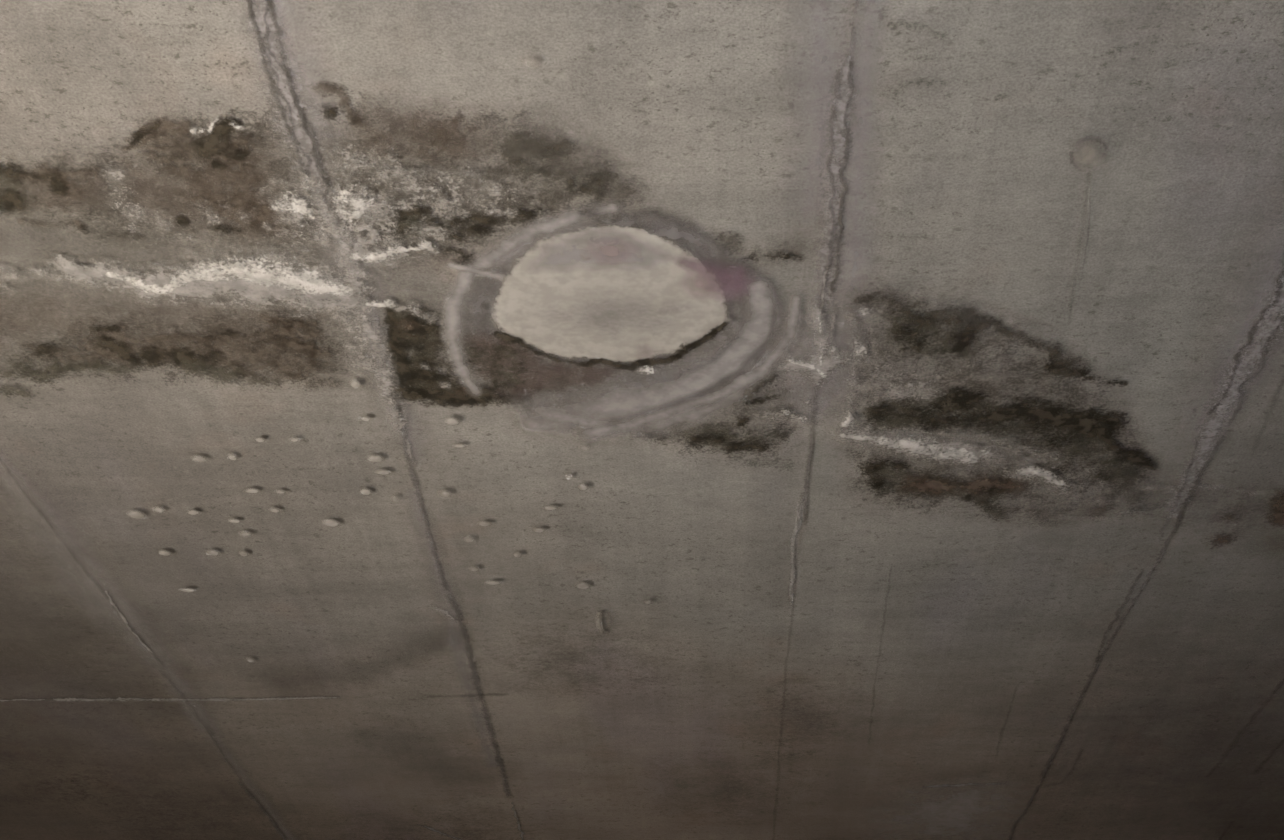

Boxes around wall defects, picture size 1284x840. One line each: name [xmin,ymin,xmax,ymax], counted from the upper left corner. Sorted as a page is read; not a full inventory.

water stain [0,82,618,432]
crack [247,0,416,465]
water stain [713,231,802,261]
crack [808,56,861,357]
water stain [637,291,1154,520]
crack [1166,271,1284,518]
crack [788,495,804,608]